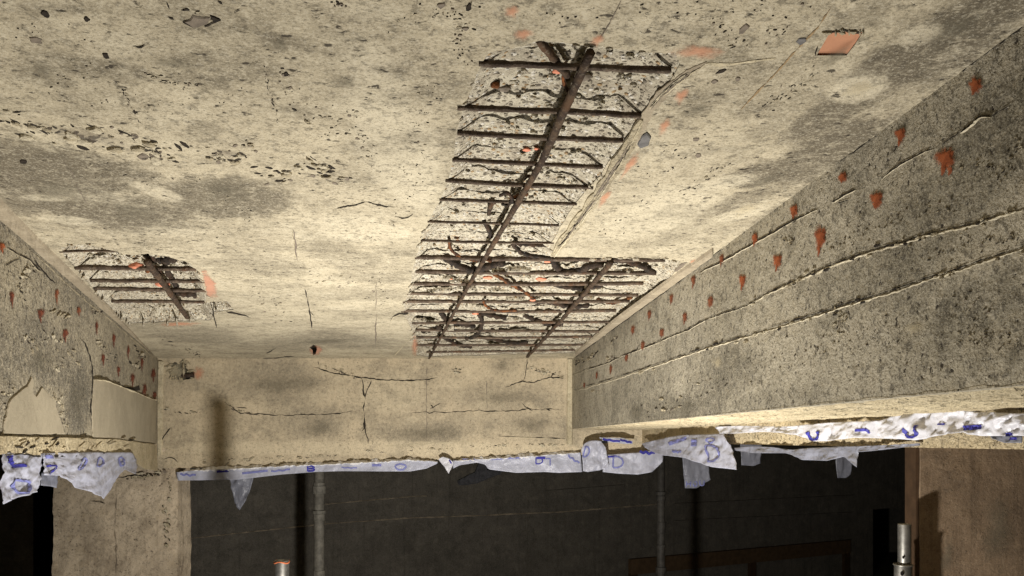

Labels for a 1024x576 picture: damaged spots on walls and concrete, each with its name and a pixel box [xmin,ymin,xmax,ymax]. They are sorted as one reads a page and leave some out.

peeling [822,28,864,37]
rust [969,78,982,95]
spalling [401,1,680,379]
crack [674,189,856,273]
rust [814,229,825,257]
rust [870,193,882,209]
crack [880,106,1008,179]
rust [934,150,954,176]
spalling [59,243,234,327]
rust [117,345,157,399]
crack [225,295,767,440]
peeling [1,376,197,457]